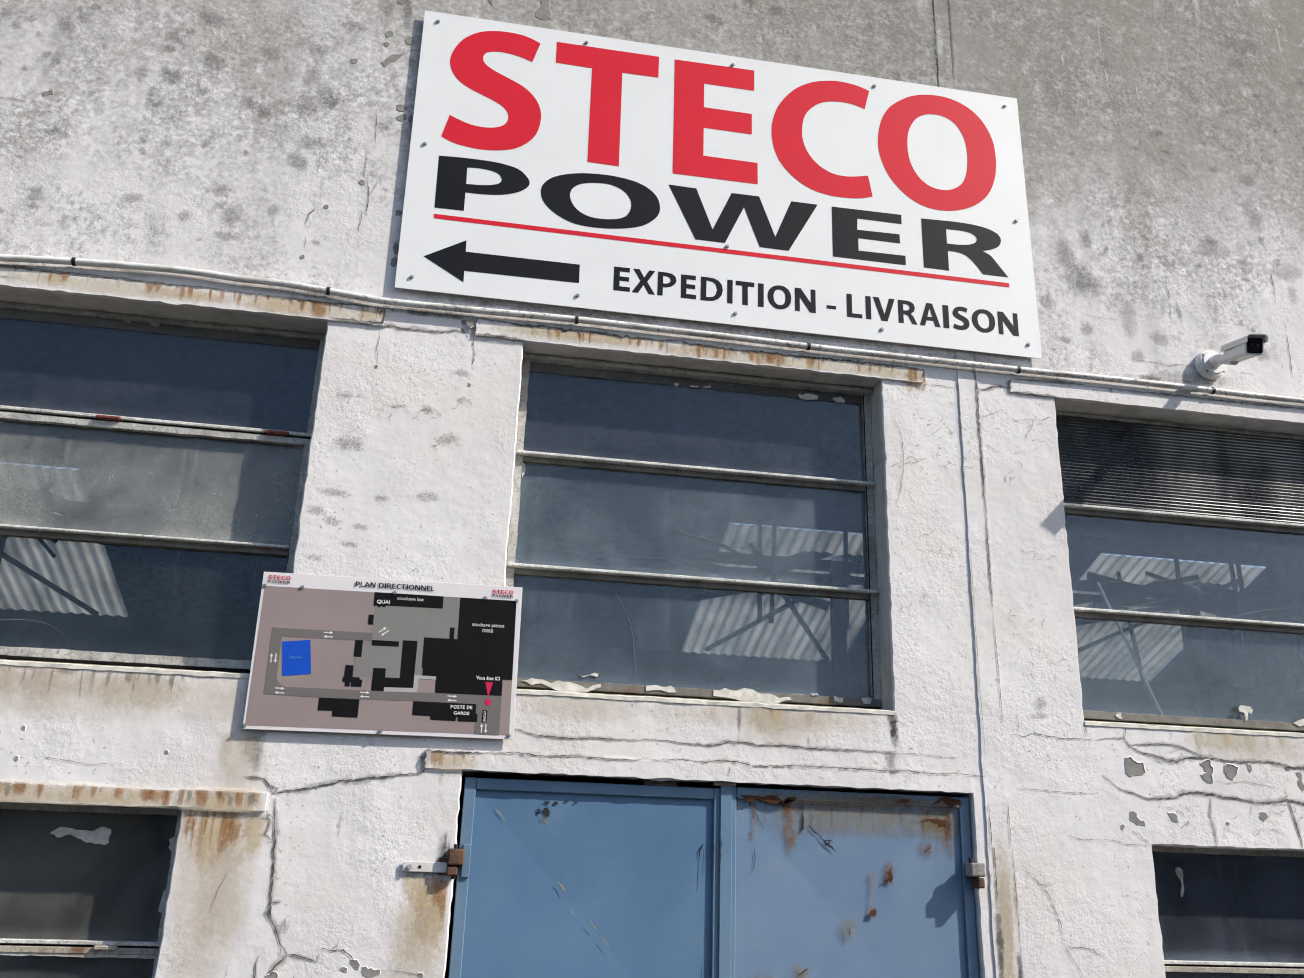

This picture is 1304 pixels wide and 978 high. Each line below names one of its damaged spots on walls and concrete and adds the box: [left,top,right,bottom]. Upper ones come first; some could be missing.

crack [934,2,955,84]
crack [1,265,1304,978]
peeling [1124,756,1146,777]
peeling [1200,759,1252,784]
peeling [1284,766,1304,791]
rust [143,790,241,849]
rust [740,795,836,852]
rust [881,797,962,843]
peeling [1120,810,1146,830]
peeling [339,959,381,978]